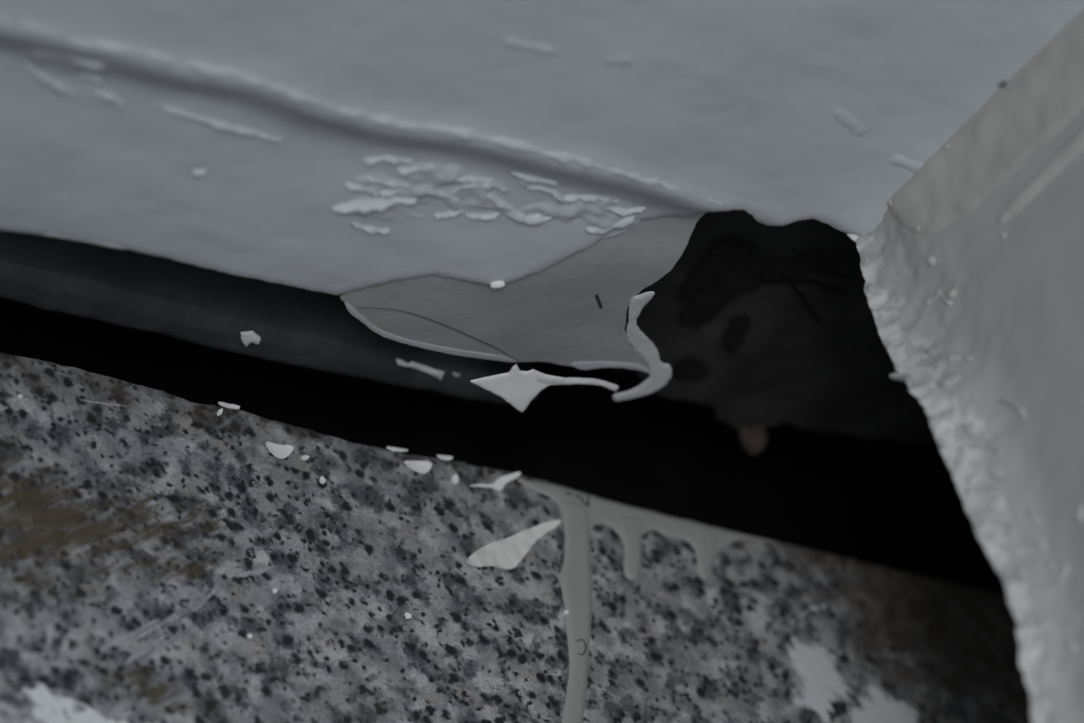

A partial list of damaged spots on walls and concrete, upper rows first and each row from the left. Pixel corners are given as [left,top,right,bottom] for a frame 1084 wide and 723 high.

peeling [331,155,706,412]